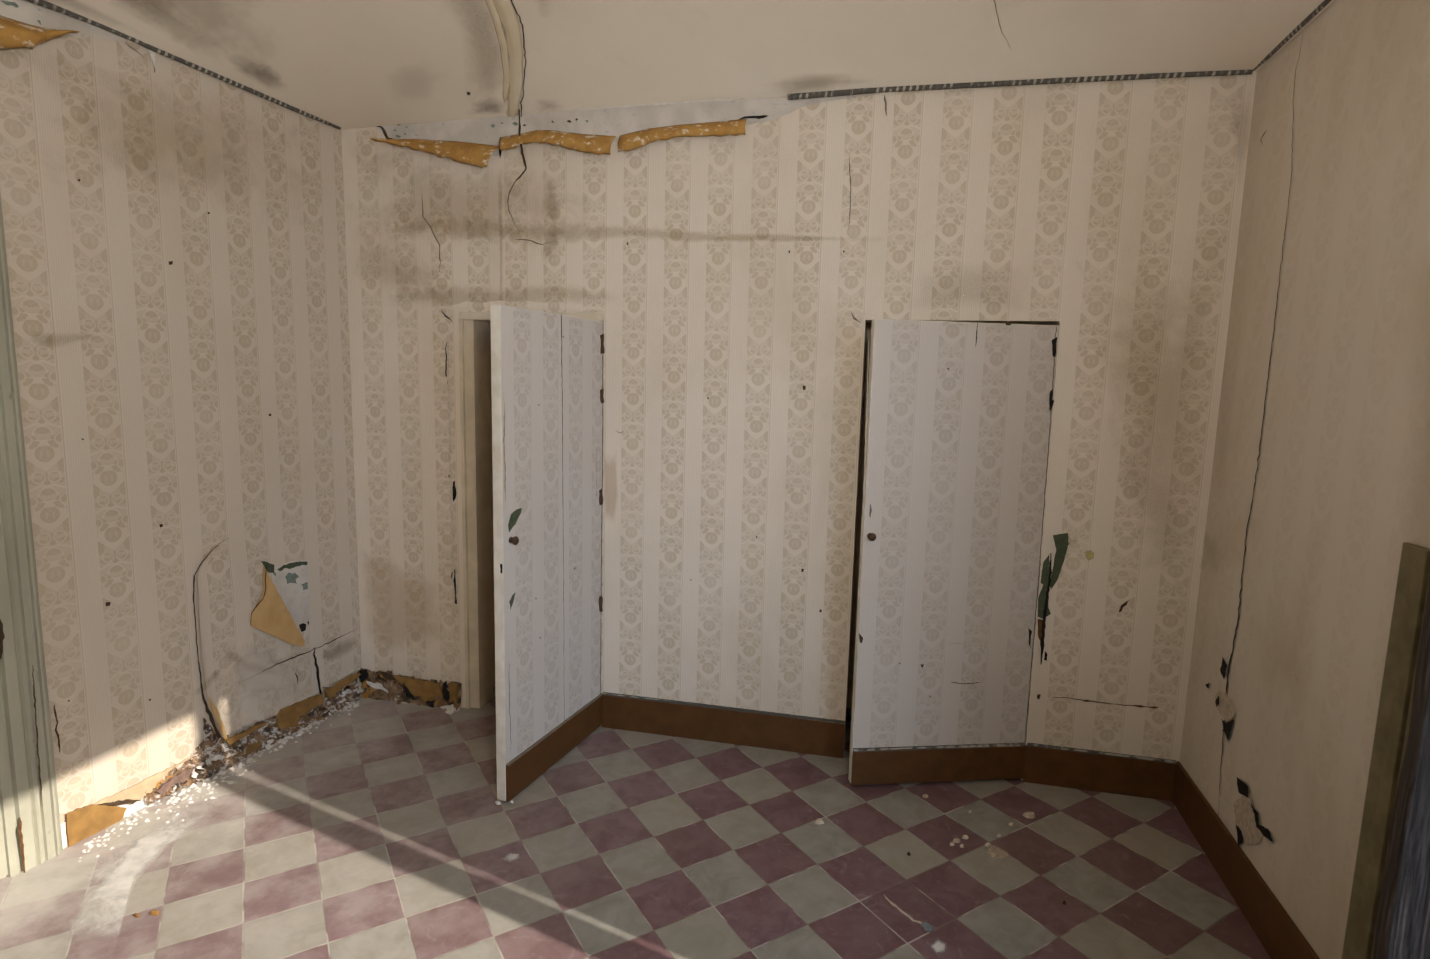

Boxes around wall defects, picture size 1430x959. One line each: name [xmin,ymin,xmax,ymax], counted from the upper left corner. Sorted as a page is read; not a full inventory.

flaking render [0,0,116,36]
crack [507,0,549,245]
flaking render [376,94,860,156]
crack [422,202,441,264]
crack [193,539,226,739]
crack [240,631,352,694]
peeling [65,669,460,847]